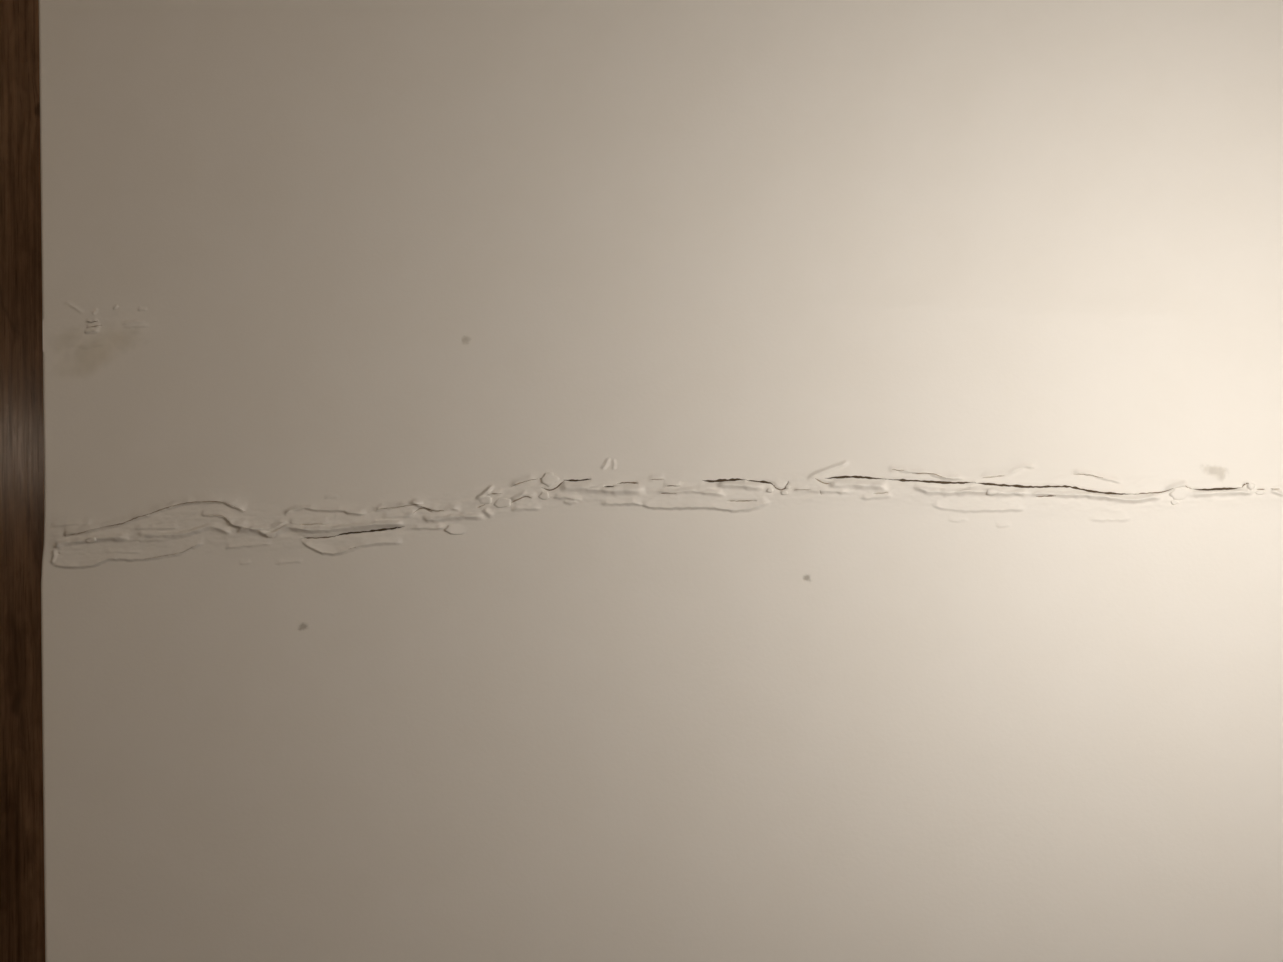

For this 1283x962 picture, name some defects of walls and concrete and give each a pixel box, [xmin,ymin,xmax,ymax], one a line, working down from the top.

crack [48,457,1283,572]